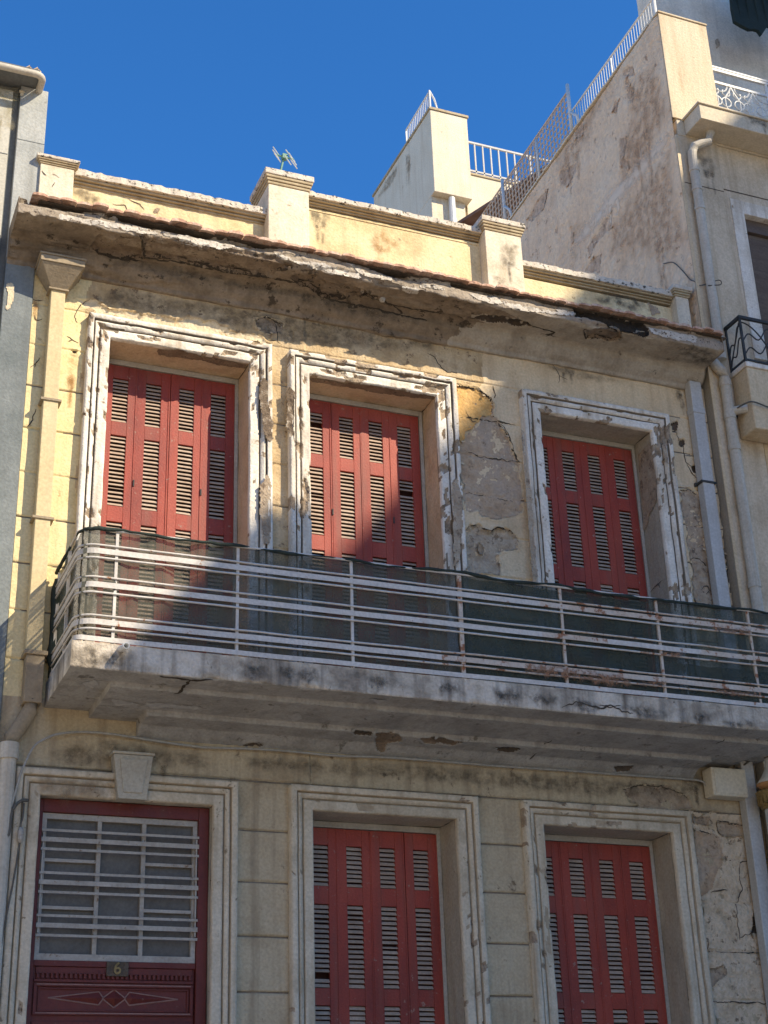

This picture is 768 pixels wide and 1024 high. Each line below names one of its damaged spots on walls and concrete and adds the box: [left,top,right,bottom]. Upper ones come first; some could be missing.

crack [99,253,462,321]
spalling [463,293,697,343]
spalling [157,349,246,369]
peeling [451,384,523,575]
peeling [638,442,657,530]
peeling [679,488,713,605]
crack [160,676,211,694]
spalling [352,728,402,752]
crack [563,701,631,714]
peeling [623,783,768,1024]